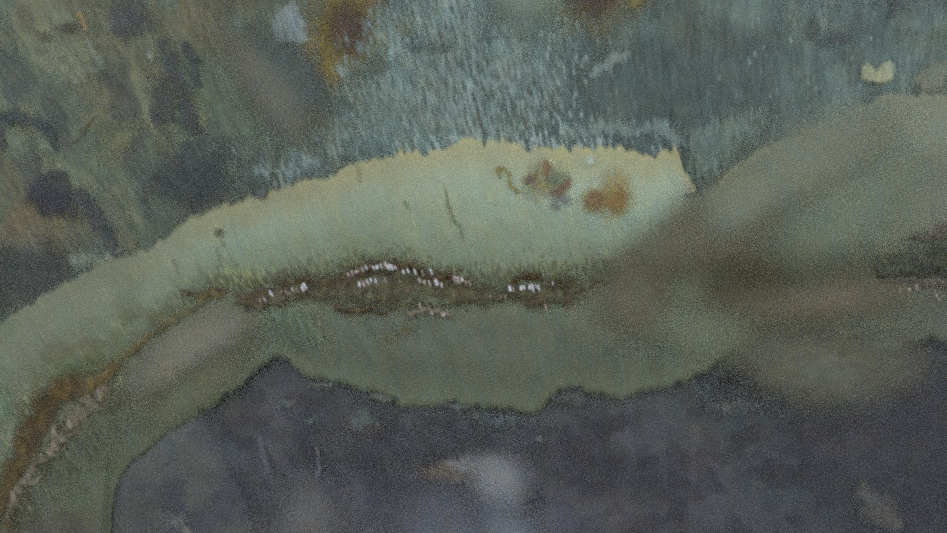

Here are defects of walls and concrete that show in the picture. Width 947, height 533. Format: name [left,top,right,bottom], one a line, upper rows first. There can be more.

rust [310,0,382,80]
rust [496,160,571,210]
rust [582,173,634,214]